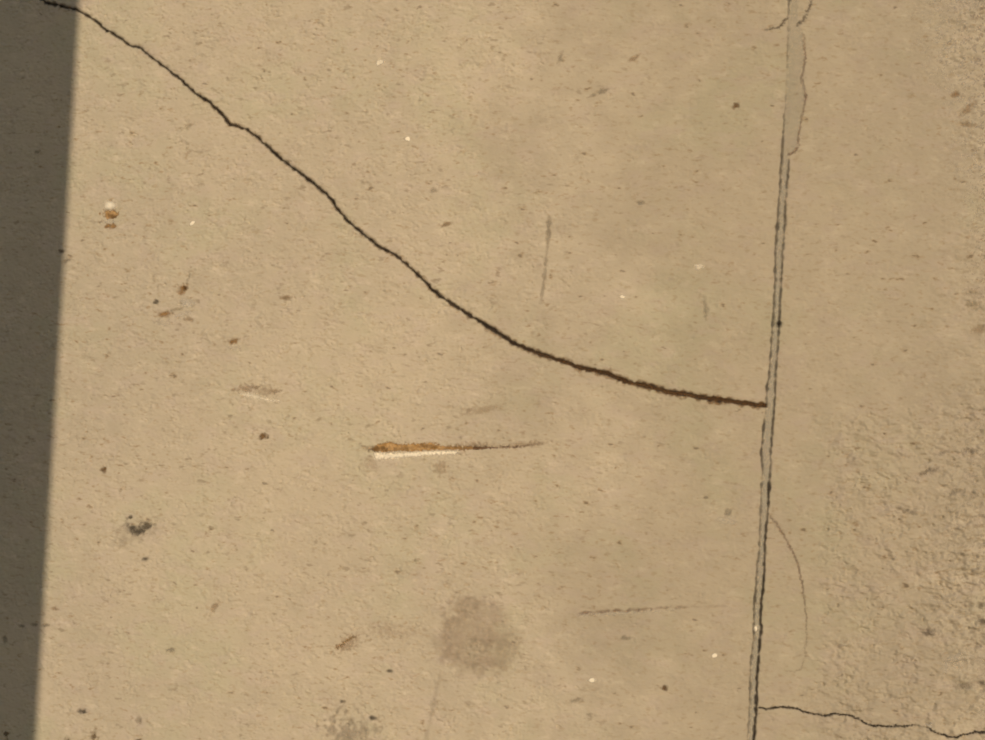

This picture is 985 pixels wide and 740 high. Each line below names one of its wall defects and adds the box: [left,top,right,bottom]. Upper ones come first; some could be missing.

crack [43,0,774,456]
crack [753,476,985,740]